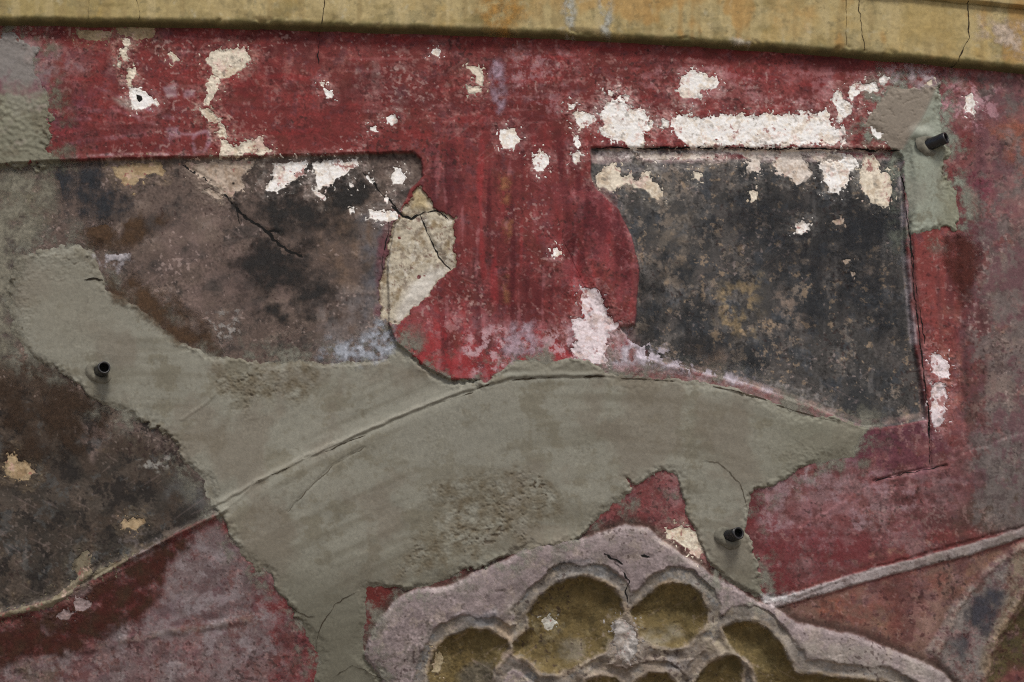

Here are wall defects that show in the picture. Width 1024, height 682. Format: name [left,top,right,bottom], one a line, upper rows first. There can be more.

peeling [67,26,182,117]
crack [846,0,865,50]
crack [949,1,970,68]
crack [183,165,303,257]
spalling [105,40,457,325]
crack [363,173,451,270]
peeling [561,65,901,215]
peeling [565,285,622,369]
crack [585,146,944,482]
peeling [921,349,955,432]